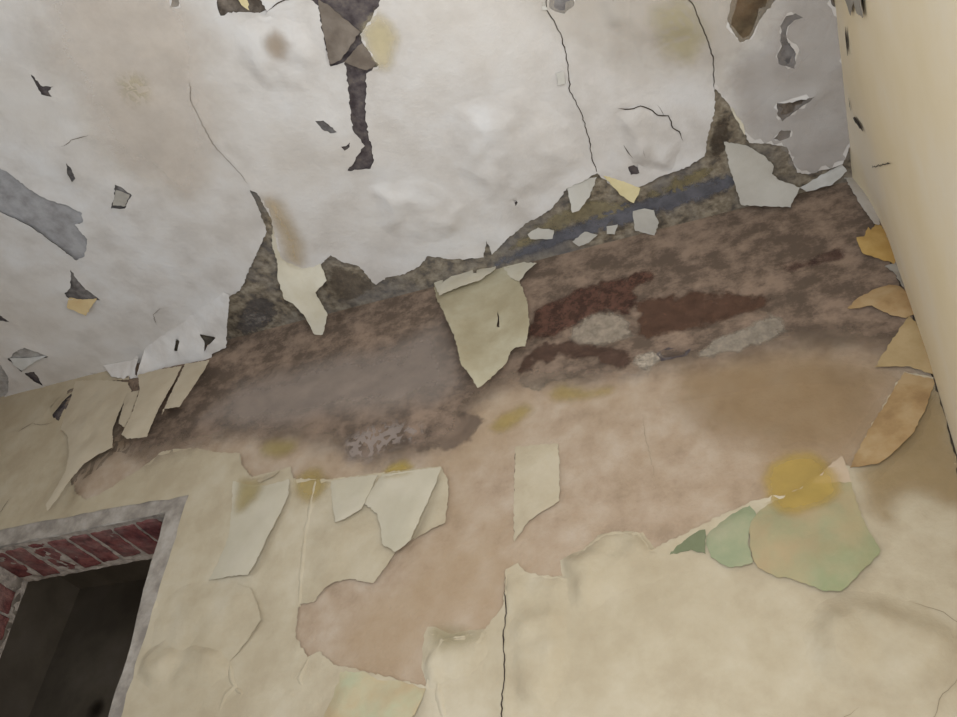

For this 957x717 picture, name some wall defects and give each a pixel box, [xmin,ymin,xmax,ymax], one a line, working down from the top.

peeling [217,0,266,16]
peeling [312,0,380,171]
crack [546,0,597,172]
crack [619,106,683,140]
crack [688,0,715,86]
peeling [727,0,775,42]
peeling [0,169,99,316]
peeling [46,89,935,686]
water stain [129,181,913,459]
water stain [299,473,323,497]
water stain [769,457,834,509]
crack [500,577,508,717]